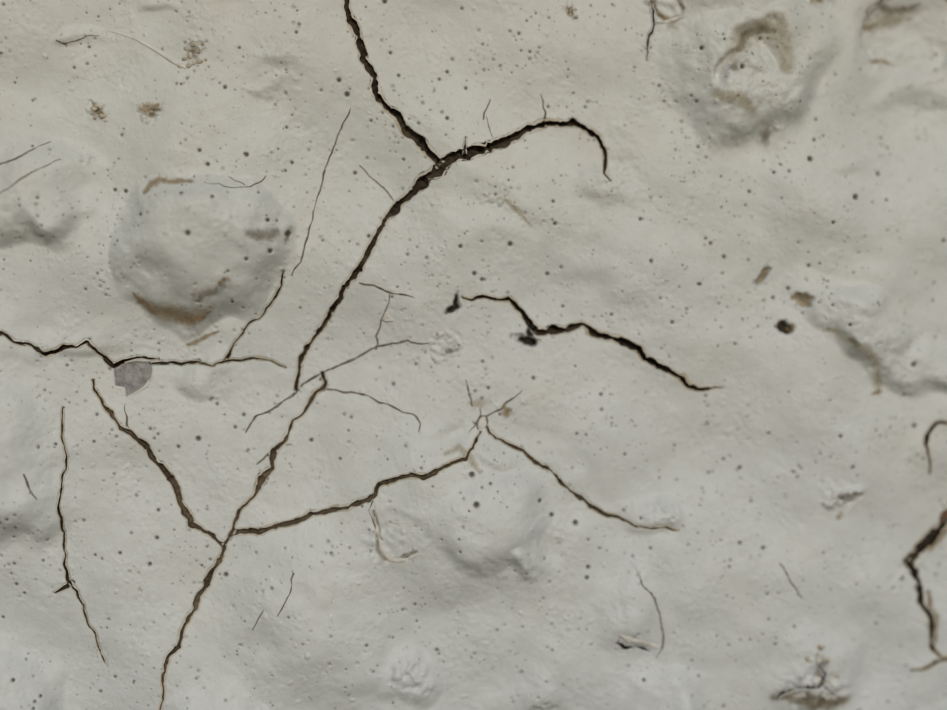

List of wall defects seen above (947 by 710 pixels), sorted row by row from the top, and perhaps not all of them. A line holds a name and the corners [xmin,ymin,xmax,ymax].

spalling [114,361,153,396]
crack [0,0,679,710]
crack [462,294,722,392]
crack [923,419,947,474]
crack [904,508,947,672]